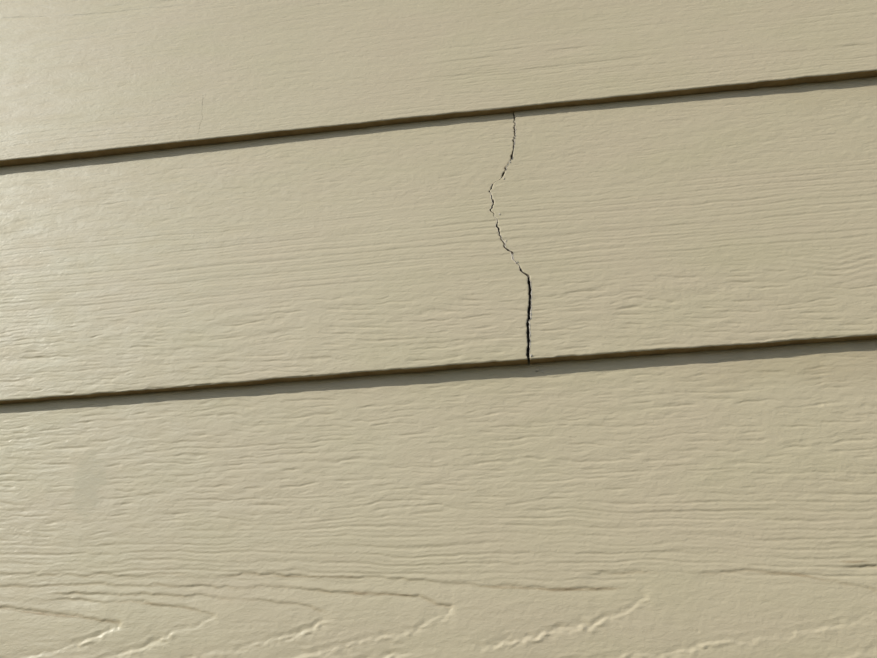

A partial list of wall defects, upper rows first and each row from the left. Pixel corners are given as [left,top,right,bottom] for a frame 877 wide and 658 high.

crack [489,114,543,373]